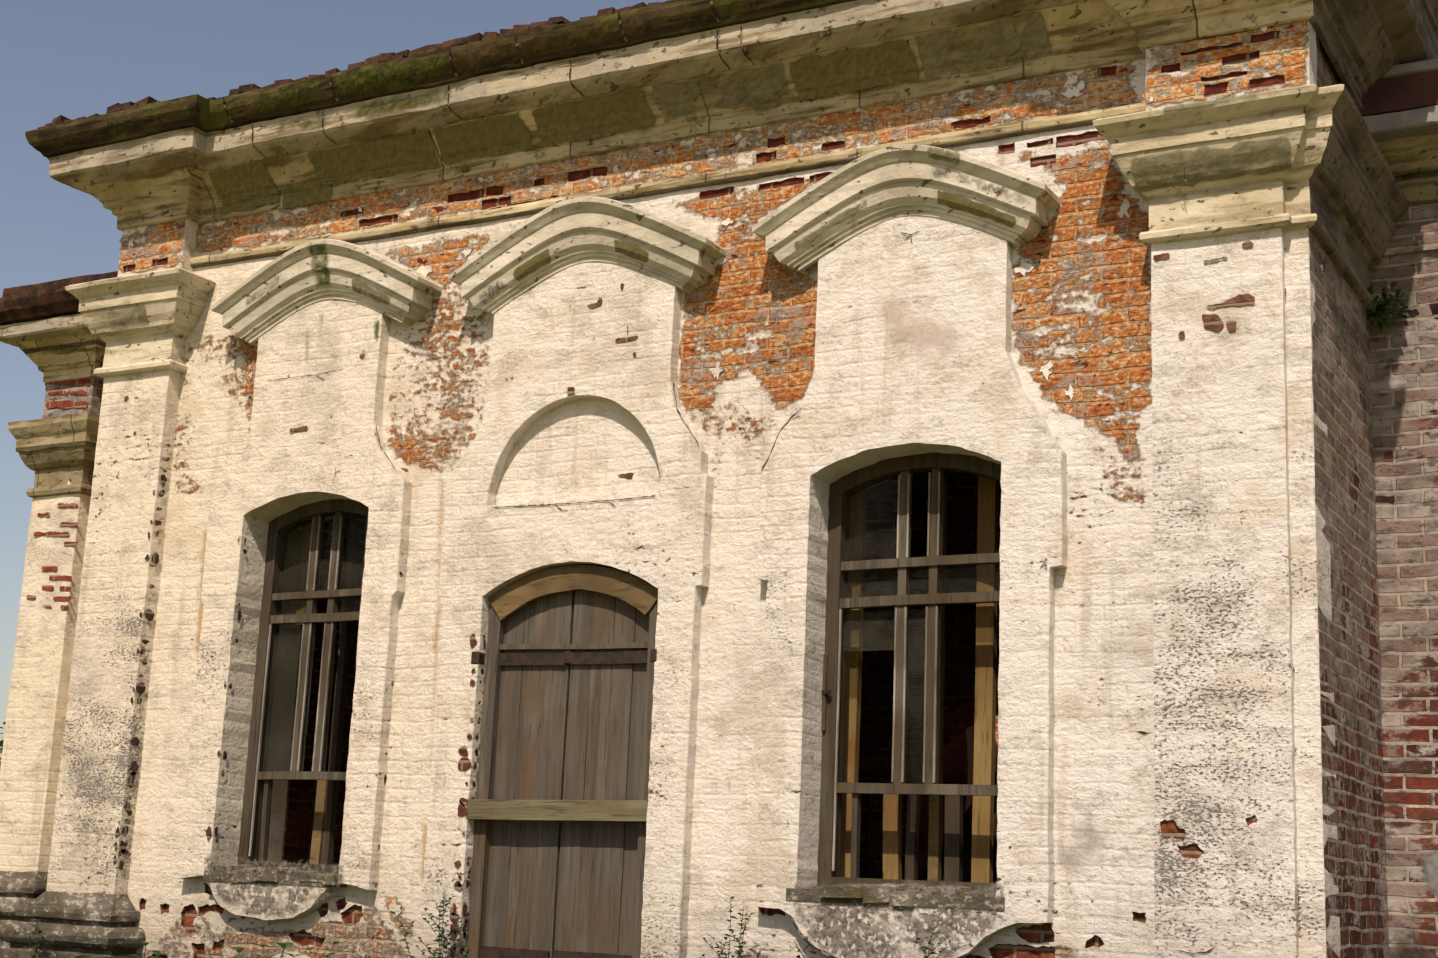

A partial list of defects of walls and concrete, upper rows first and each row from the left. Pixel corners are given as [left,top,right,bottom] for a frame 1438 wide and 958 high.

flaking render [118,19,1314,273]
damp [82,0,1400,231]
spalling [26,565,72,610]
spalling [34,503,79,547]
flaking render [144,334,258,567]
flaking render [385,233,489,473]
flaking render [672,172,831,474]
flaking render [997,132,1291,503]
spalling [113,737,140,870]
flaking render [141,882,415,958]
spalling [967,923,1104,958]
flaking render [1161,820,1205,859]